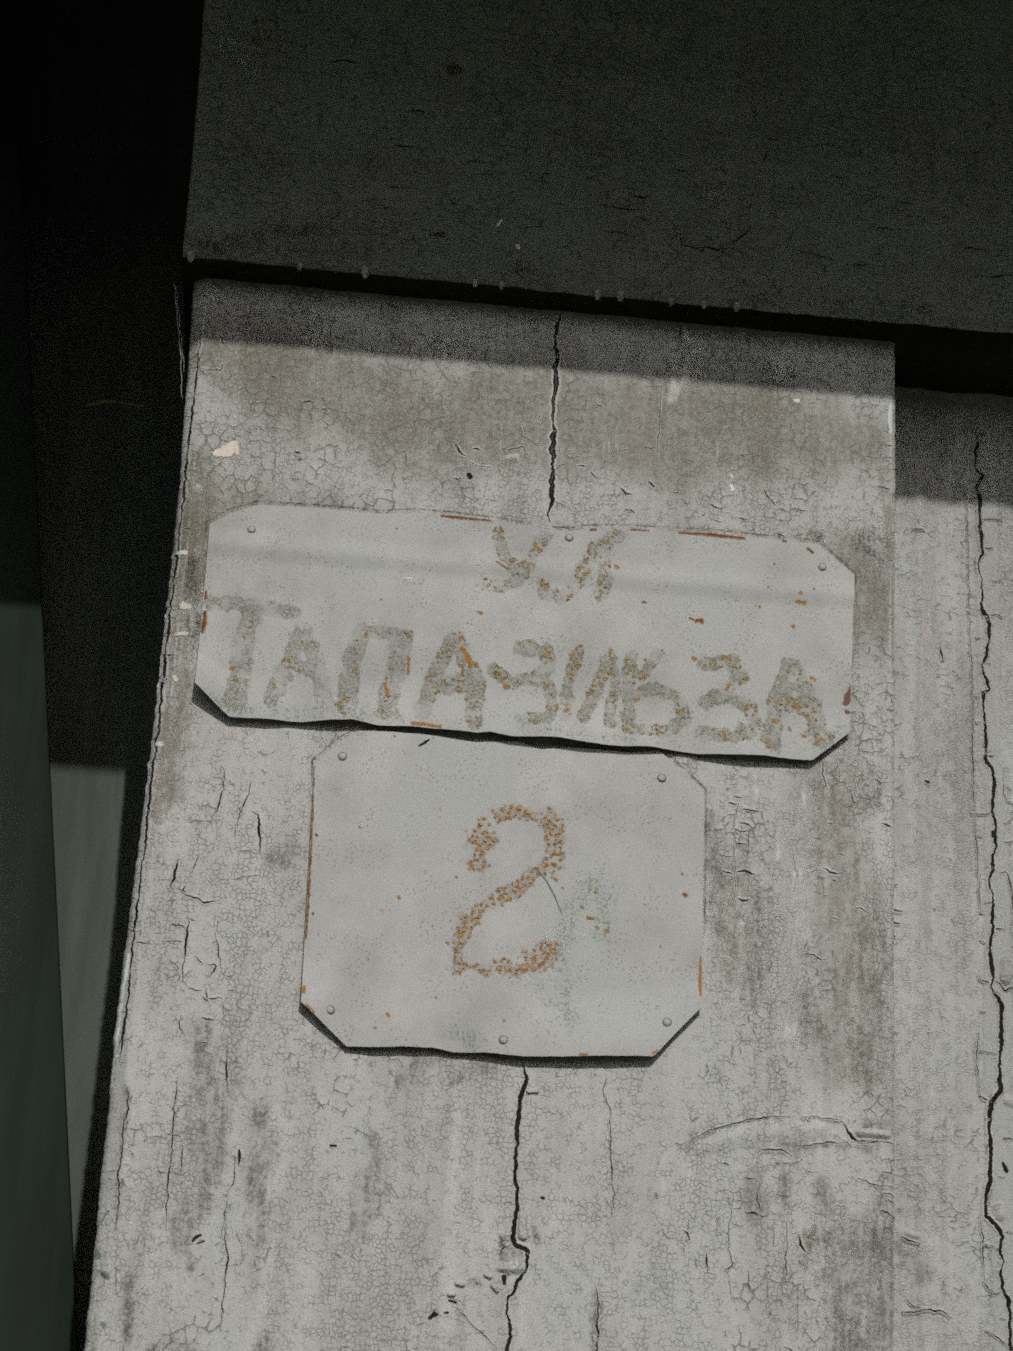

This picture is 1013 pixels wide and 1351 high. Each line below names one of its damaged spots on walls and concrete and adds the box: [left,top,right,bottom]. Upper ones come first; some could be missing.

crack [452,311,808,539]
crack [911,525,925,533]
crack [923,778,931,787]
crack [937,422,1013,1351]
crack [456,1059,533,1351]
crack [660,1114,921,1351]
crack [902,1298,951,1320]